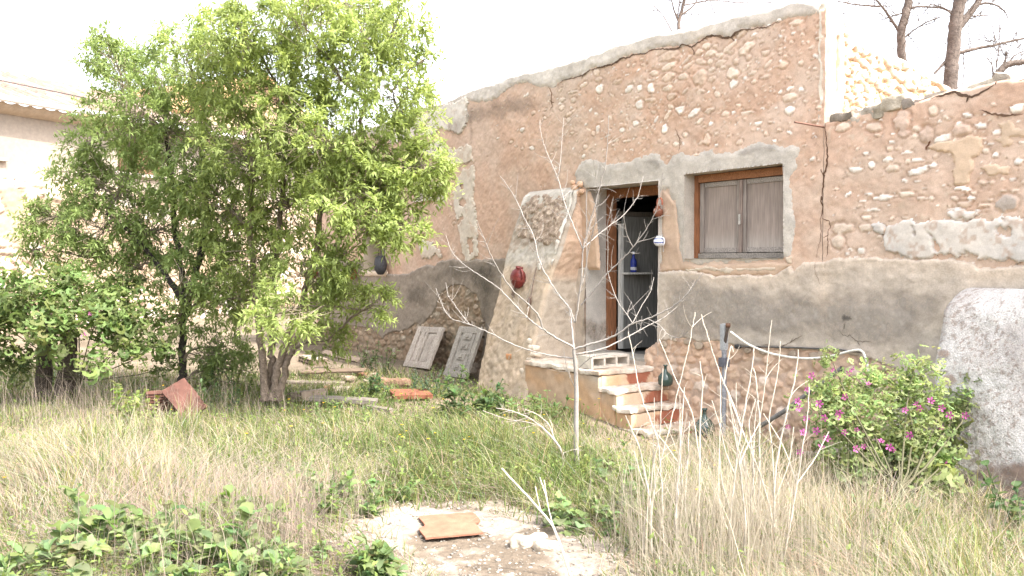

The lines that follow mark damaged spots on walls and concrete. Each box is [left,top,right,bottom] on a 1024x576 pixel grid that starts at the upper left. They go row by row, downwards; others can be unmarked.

crack [549,21,778,109]
crack [931,81,1021,117]
peeling [389,96,479,262]
spalling [517,180,584,268]
crack [814,131,831,284]
peeling [871,207,1024,265]
spalling [282,285,486,375]